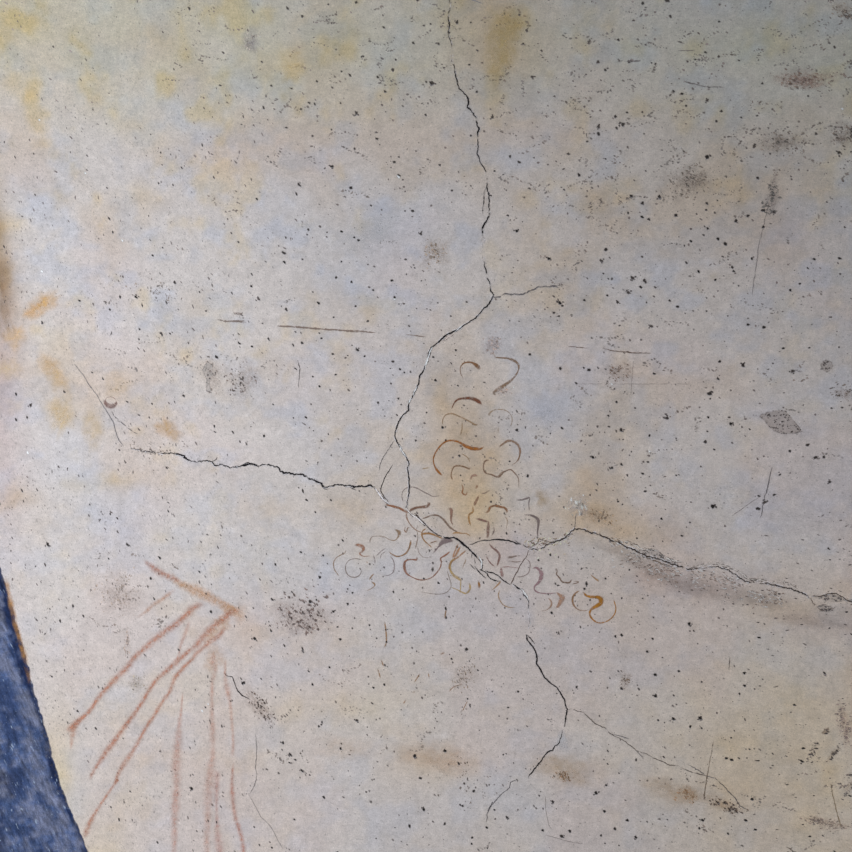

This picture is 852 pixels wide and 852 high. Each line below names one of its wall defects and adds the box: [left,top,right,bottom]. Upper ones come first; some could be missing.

crack [448,0,490,233]
crack [75,262,852,818]